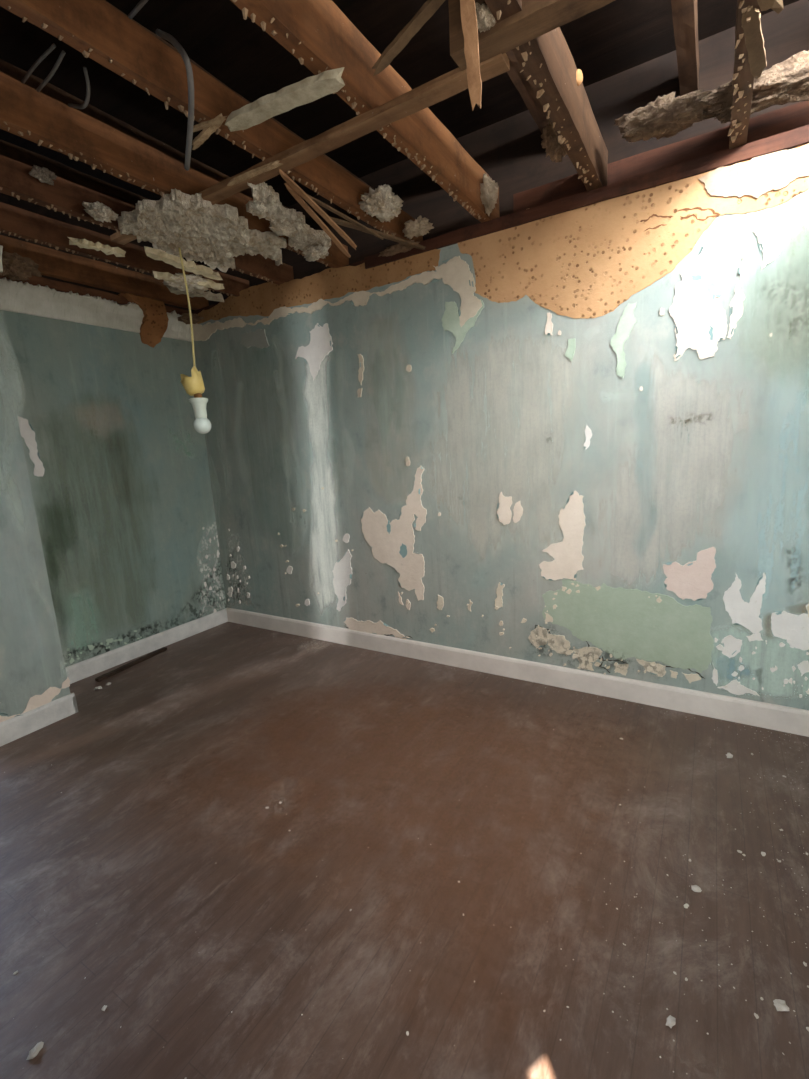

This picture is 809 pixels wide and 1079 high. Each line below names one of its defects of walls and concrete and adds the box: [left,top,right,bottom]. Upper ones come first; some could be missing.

flaking render [193,143,809,381]
crack [640,207,721,231]
peeling [17,416,45,477]
leakage [48,399,178,656]
leakage [189,522,248,620]
peeling [332,534,410,639]
peeling [361,457,441,610]
peeling [429,595,450,632]
peeling [467,582,505,636]
peeling [521,490,809,698]
peeling [0,677,70,723]